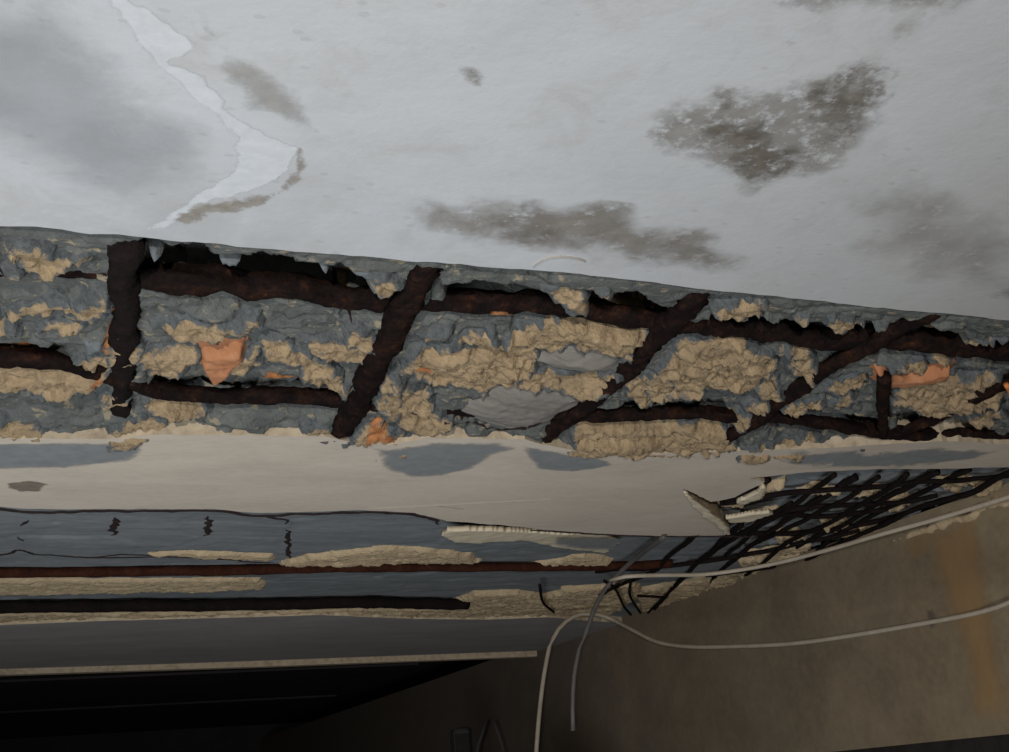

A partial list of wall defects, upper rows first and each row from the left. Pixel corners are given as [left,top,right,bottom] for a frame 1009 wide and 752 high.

water stain [111,0,303,229]
water stain [659,69,881,180]
water stain [434,206,717,263]
rust [366,417,394,445]
spalling [0,226,1009,623]
water stain [383,444,507,476]
water stain [529,449,609,471]